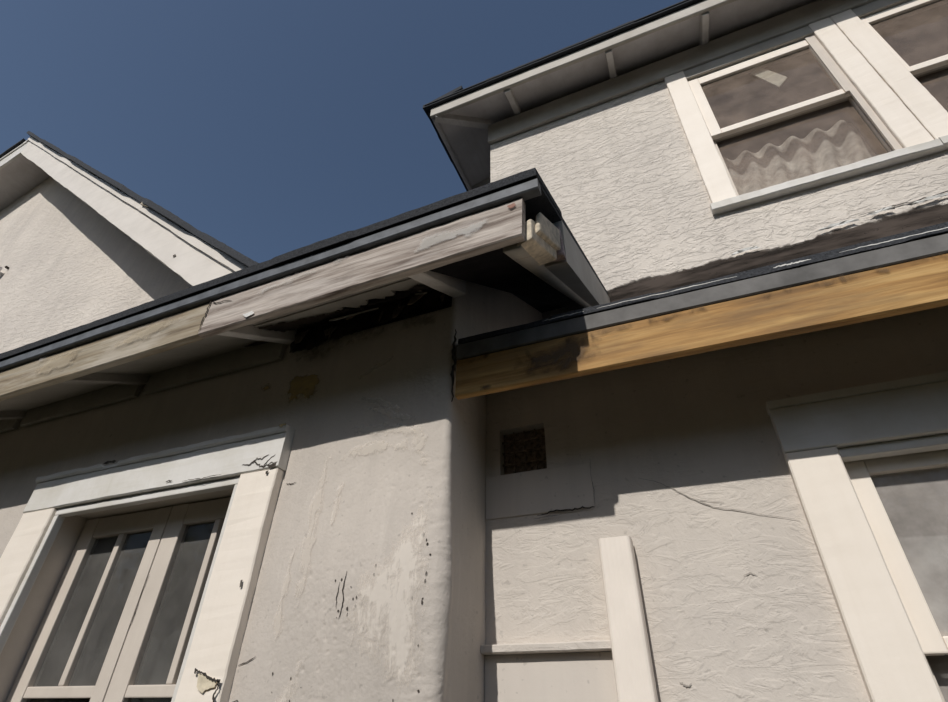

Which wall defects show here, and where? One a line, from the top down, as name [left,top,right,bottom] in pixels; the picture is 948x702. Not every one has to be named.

peeling [416,220,486,252]
crack [243,455,295,484]
crack [535,461,595,519]
crack [639,478,797,520]
spalling [194,668,221,702]